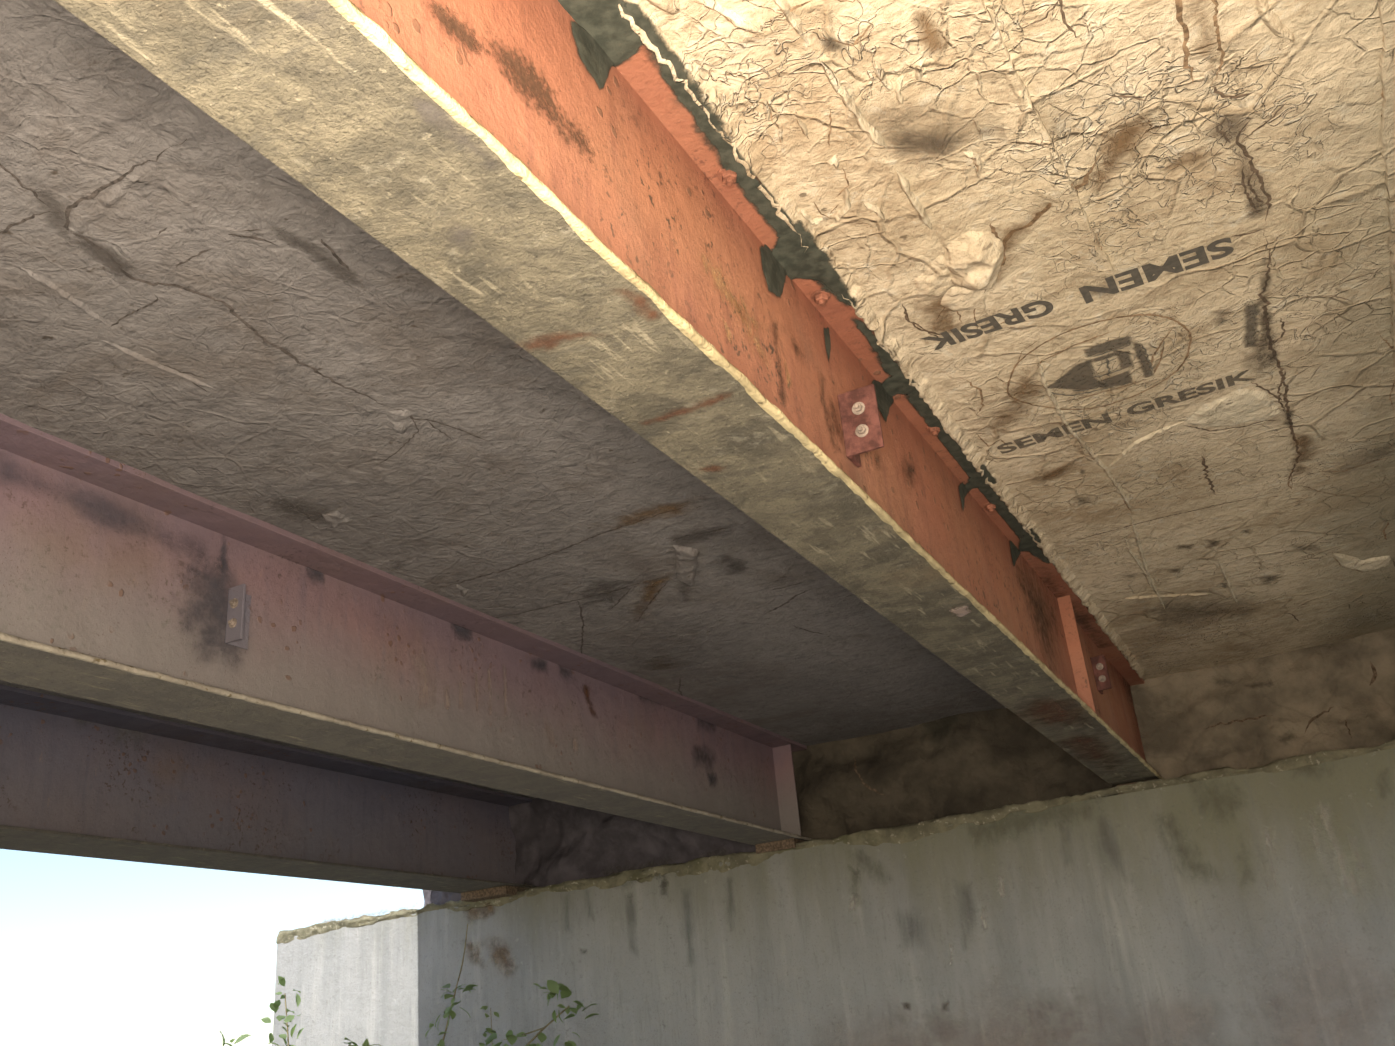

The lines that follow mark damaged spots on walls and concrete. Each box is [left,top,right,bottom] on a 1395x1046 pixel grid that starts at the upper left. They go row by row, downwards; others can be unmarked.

corrosion [431,1,593,160]
crack [1032,0,1082,41]
crack [0,139,496,465]
crack [902,148,1105,337]
crack [1055,0,1395,548]
crack [956,380,1011,462]
crack [432,502,727,654]
peeling [1333,553,1391,571]